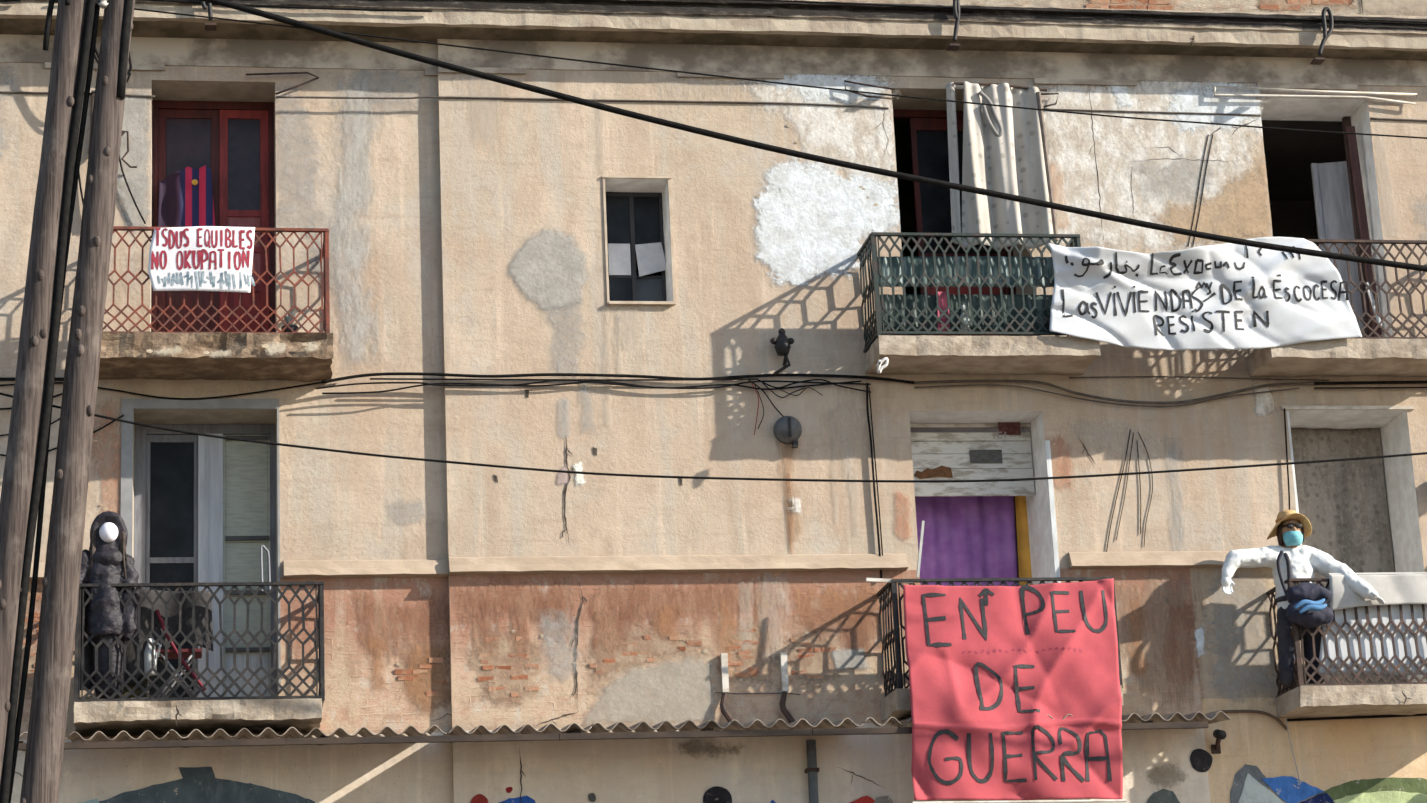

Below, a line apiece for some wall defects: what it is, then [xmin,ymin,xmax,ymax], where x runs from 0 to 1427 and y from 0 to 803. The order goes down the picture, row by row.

spalling [1086,0,1175,10]
spalling [1258,0,1356,11]
peeling [742,74,900,285]
crack [561,434,573,542]
spalling [395,653,450,713]
crack [519,583,587,803]
spalling [470,620,836,704]